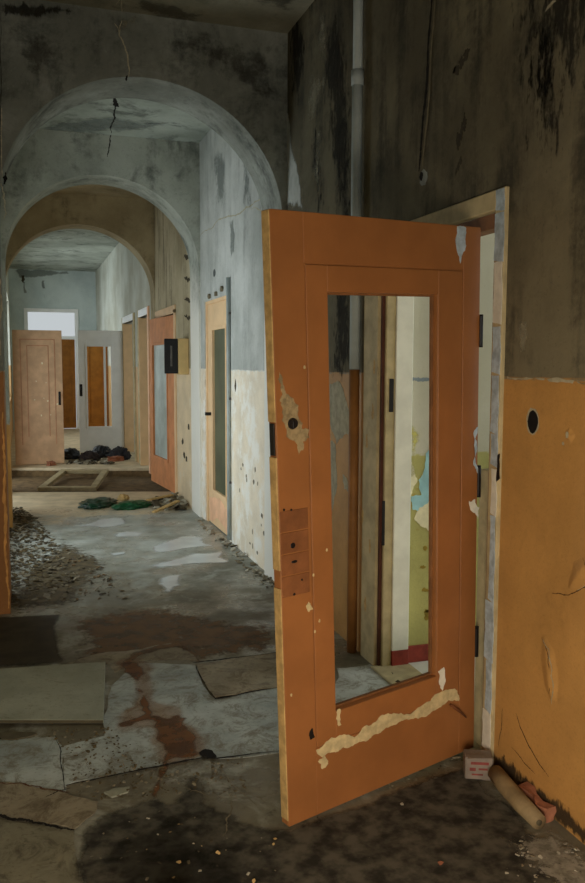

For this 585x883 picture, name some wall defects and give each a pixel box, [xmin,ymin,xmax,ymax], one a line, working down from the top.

crack [107,0,130,157]
efflorescence [287,113,302,207]
water stain [324,15,350,216]
water stain [513,0,585,155]
water stain [333,295,350,376]
peeling [104,786,129,798]
water stain [76,755,585,883]